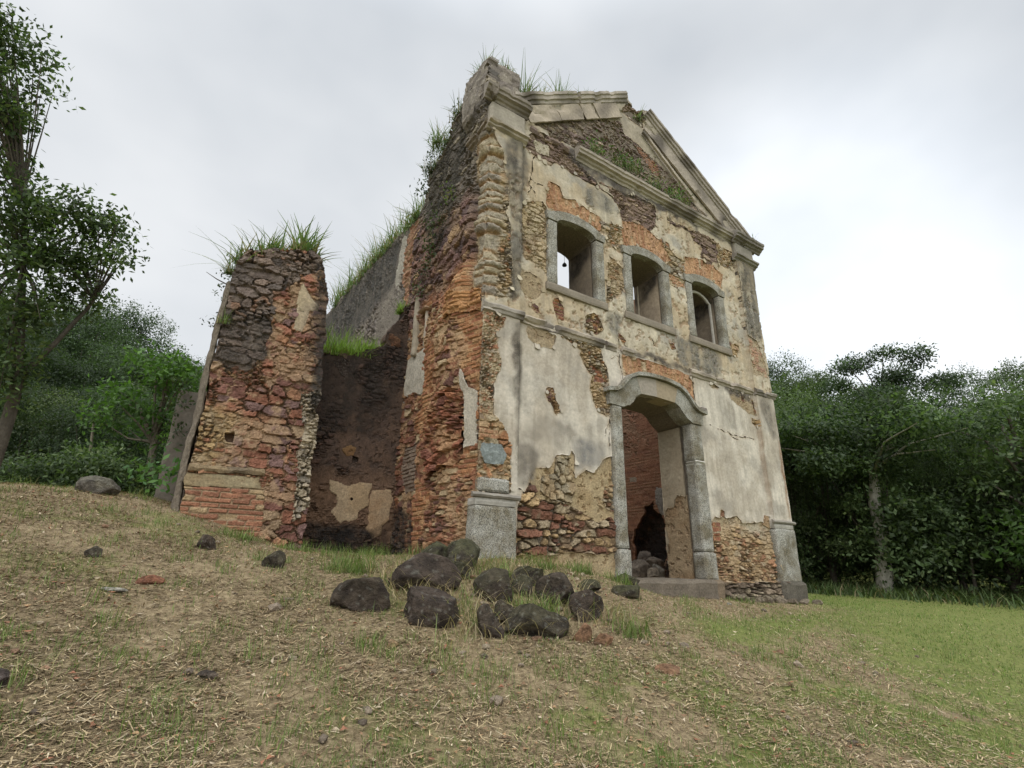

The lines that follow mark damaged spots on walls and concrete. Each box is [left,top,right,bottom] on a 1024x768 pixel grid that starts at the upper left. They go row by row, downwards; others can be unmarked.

flaking render [419,104,738,579]
flaking render [711,515,783,583]